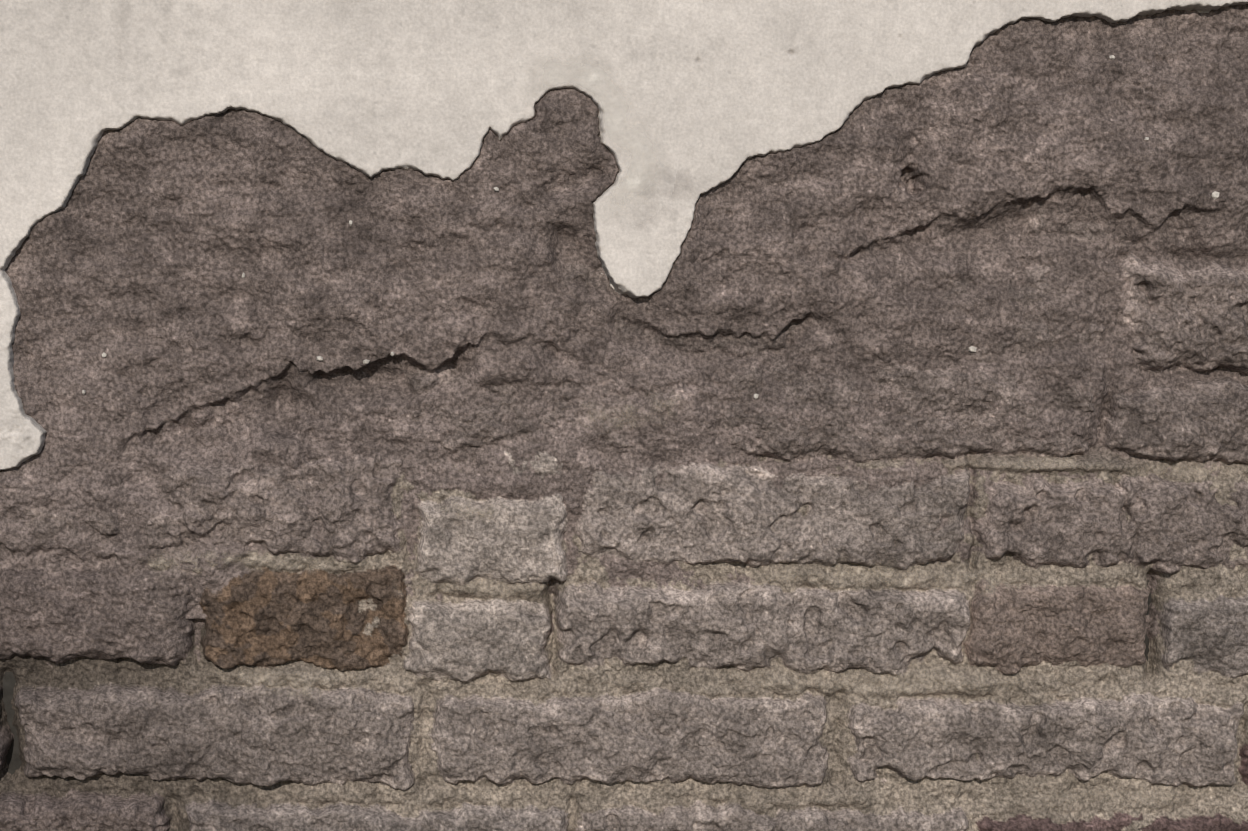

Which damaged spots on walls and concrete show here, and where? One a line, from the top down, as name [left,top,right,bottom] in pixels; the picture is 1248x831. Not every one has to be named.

flaking render [0,0,1248,649]
spalling [0,565,197,667]
spalling [195,566,415,672]
spalling [404,594,553,683]
spalling [556,569,1149,677]
spalling [1152,595,1248,679]
spalling [14,683,416,791]
spalling [429,688,830,789]
spalling [847,692,1248,787]
spalling [977,813,1248,831]